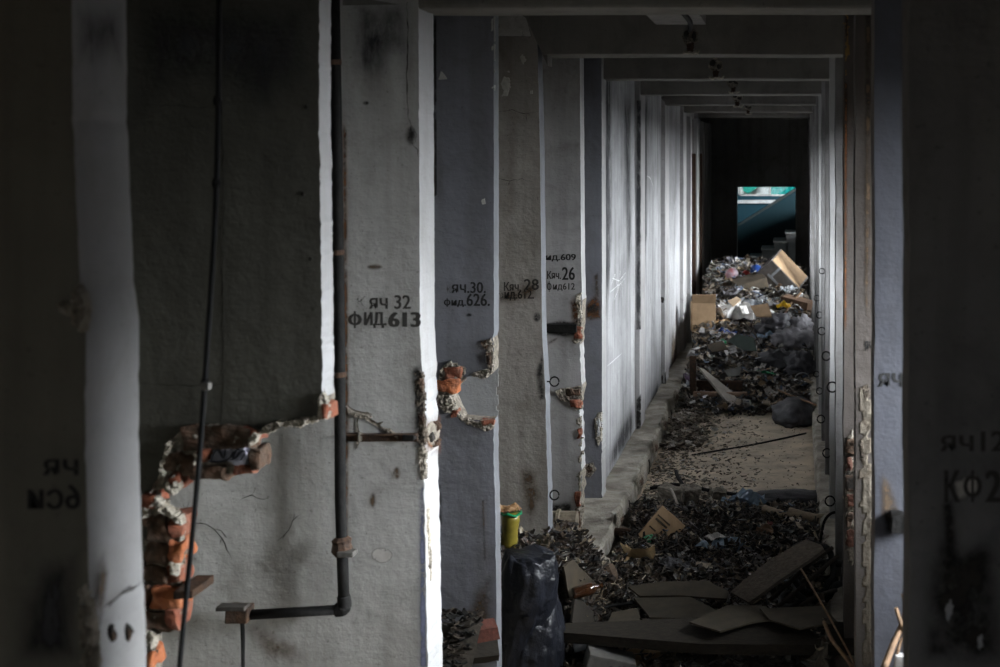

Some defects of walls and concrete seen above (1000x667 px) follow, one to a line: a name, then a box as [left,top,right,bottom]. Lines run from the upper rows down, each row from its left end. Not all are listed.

flaking render [572,293,583,344]
flaking render [142,389,372,667]
flaking render [413,338,496,480]
flaking render [555,386,603,534]
peeling [842,384,872,666]